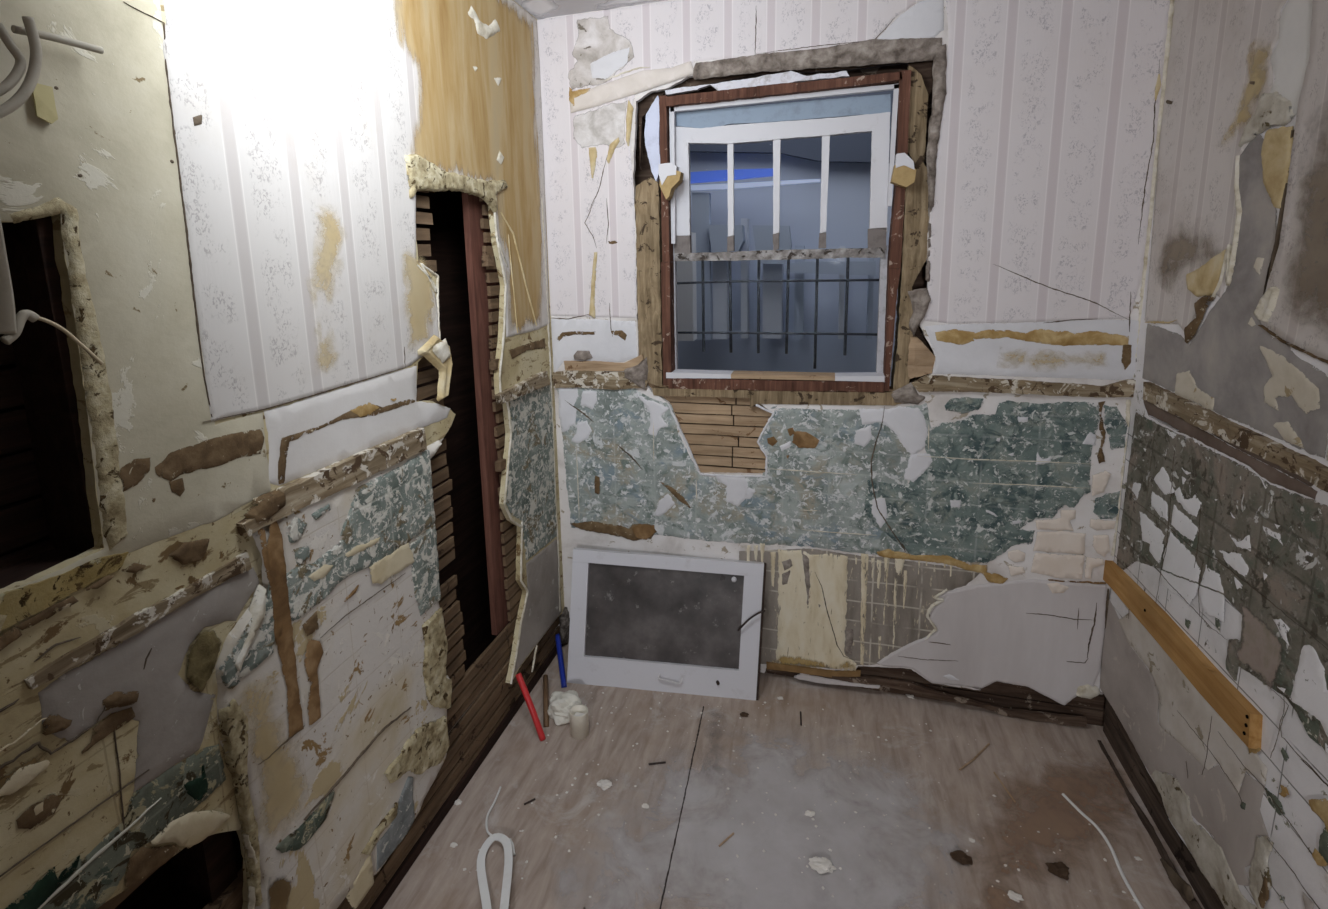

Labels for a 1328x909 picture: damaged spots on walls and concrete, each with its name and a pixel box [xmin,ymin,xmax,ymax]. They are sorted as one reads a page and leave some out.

flaking render [568,16,634,90]
crack [996,265,1176,332]
flaking render [1142,0,1328,459]
water stain [1292,163,1328,323]
peeling [244,154,1328,909]
flaking render [0,563,335,909]